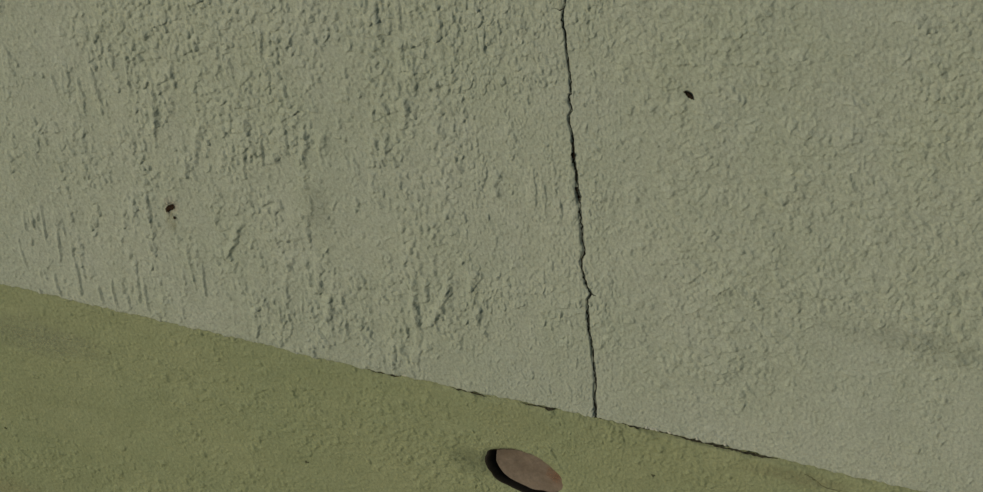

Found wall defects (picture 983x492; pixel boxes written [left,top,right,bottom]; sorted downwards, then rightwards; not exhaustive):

crack [554,0,597,418]